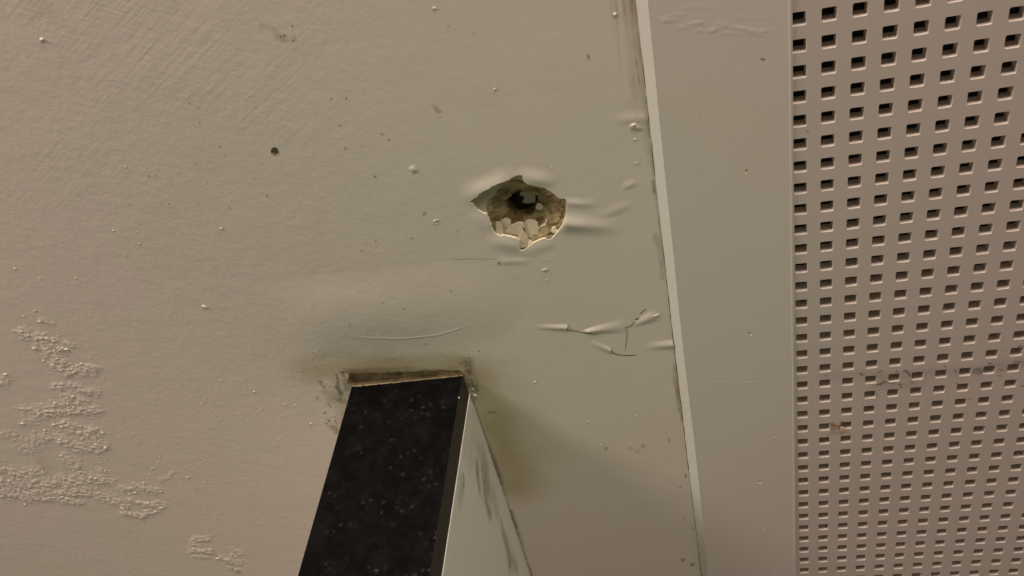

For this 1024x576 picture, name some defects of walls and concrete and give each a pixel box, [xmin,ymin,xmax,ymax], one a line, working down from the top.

hole [453,164,583,258]
crack [568,251,702,576]